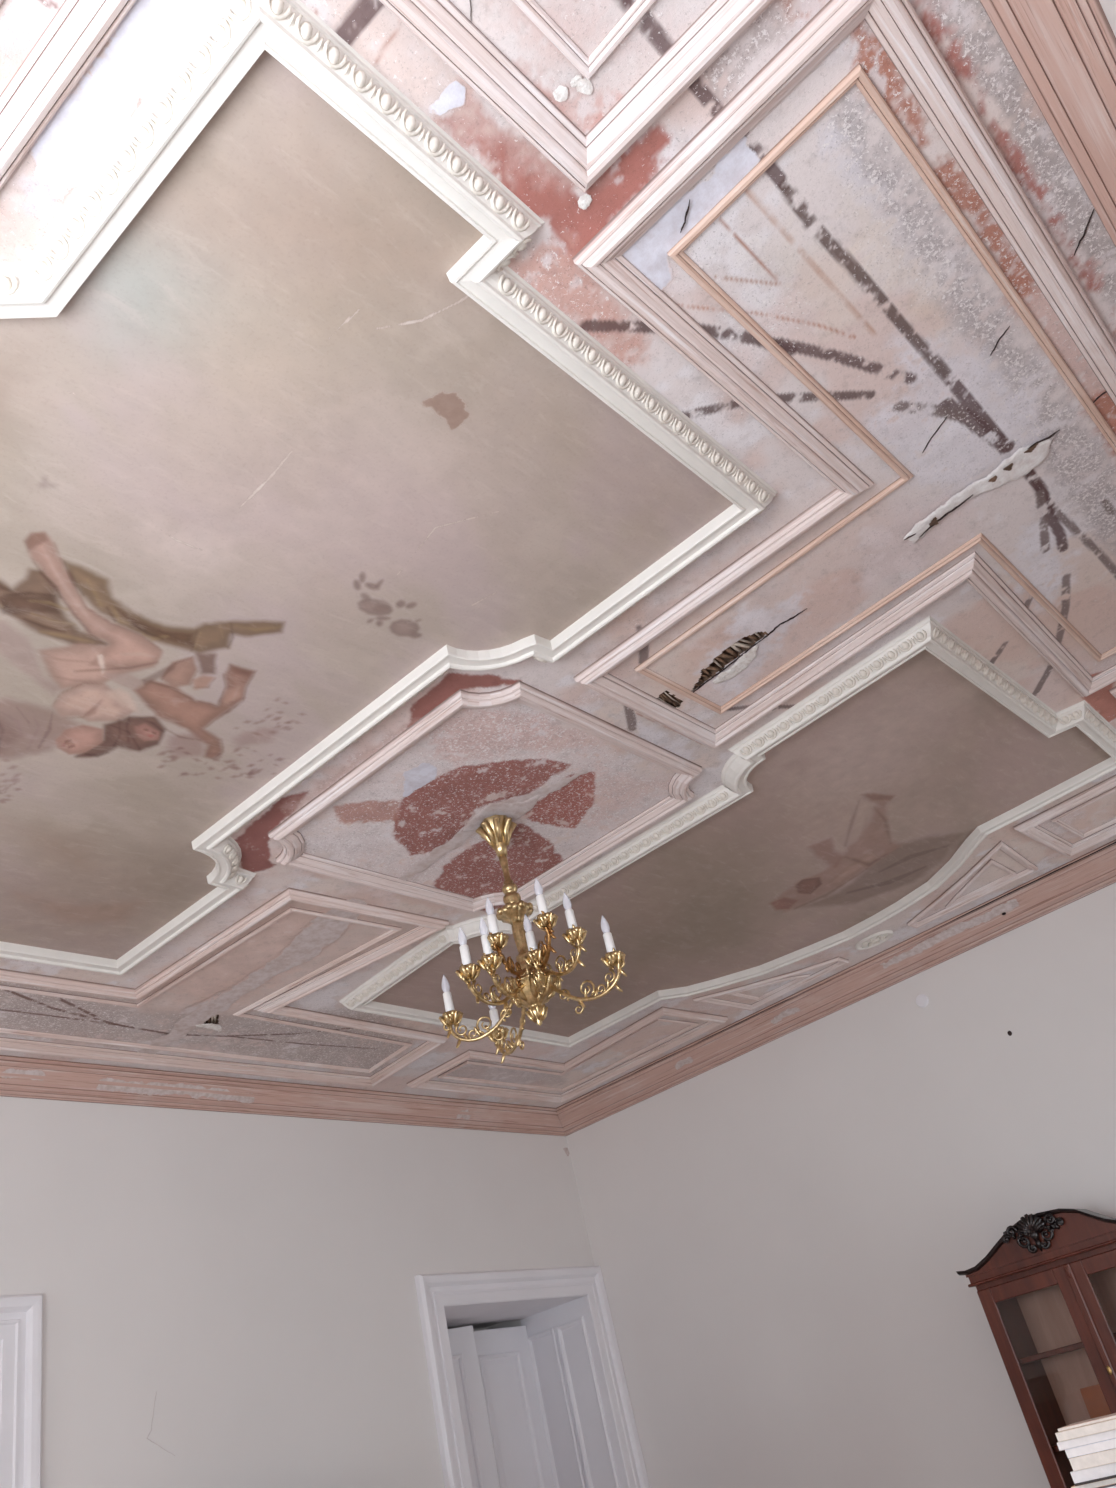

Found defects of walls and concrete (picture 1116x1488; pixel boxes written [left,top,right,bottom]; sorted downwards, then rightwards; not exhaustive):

flaking render [28,0,219,205]
peeling [577,193,593,210]
water stain [421,391,470,431]
flaking render [402,762,438,797]